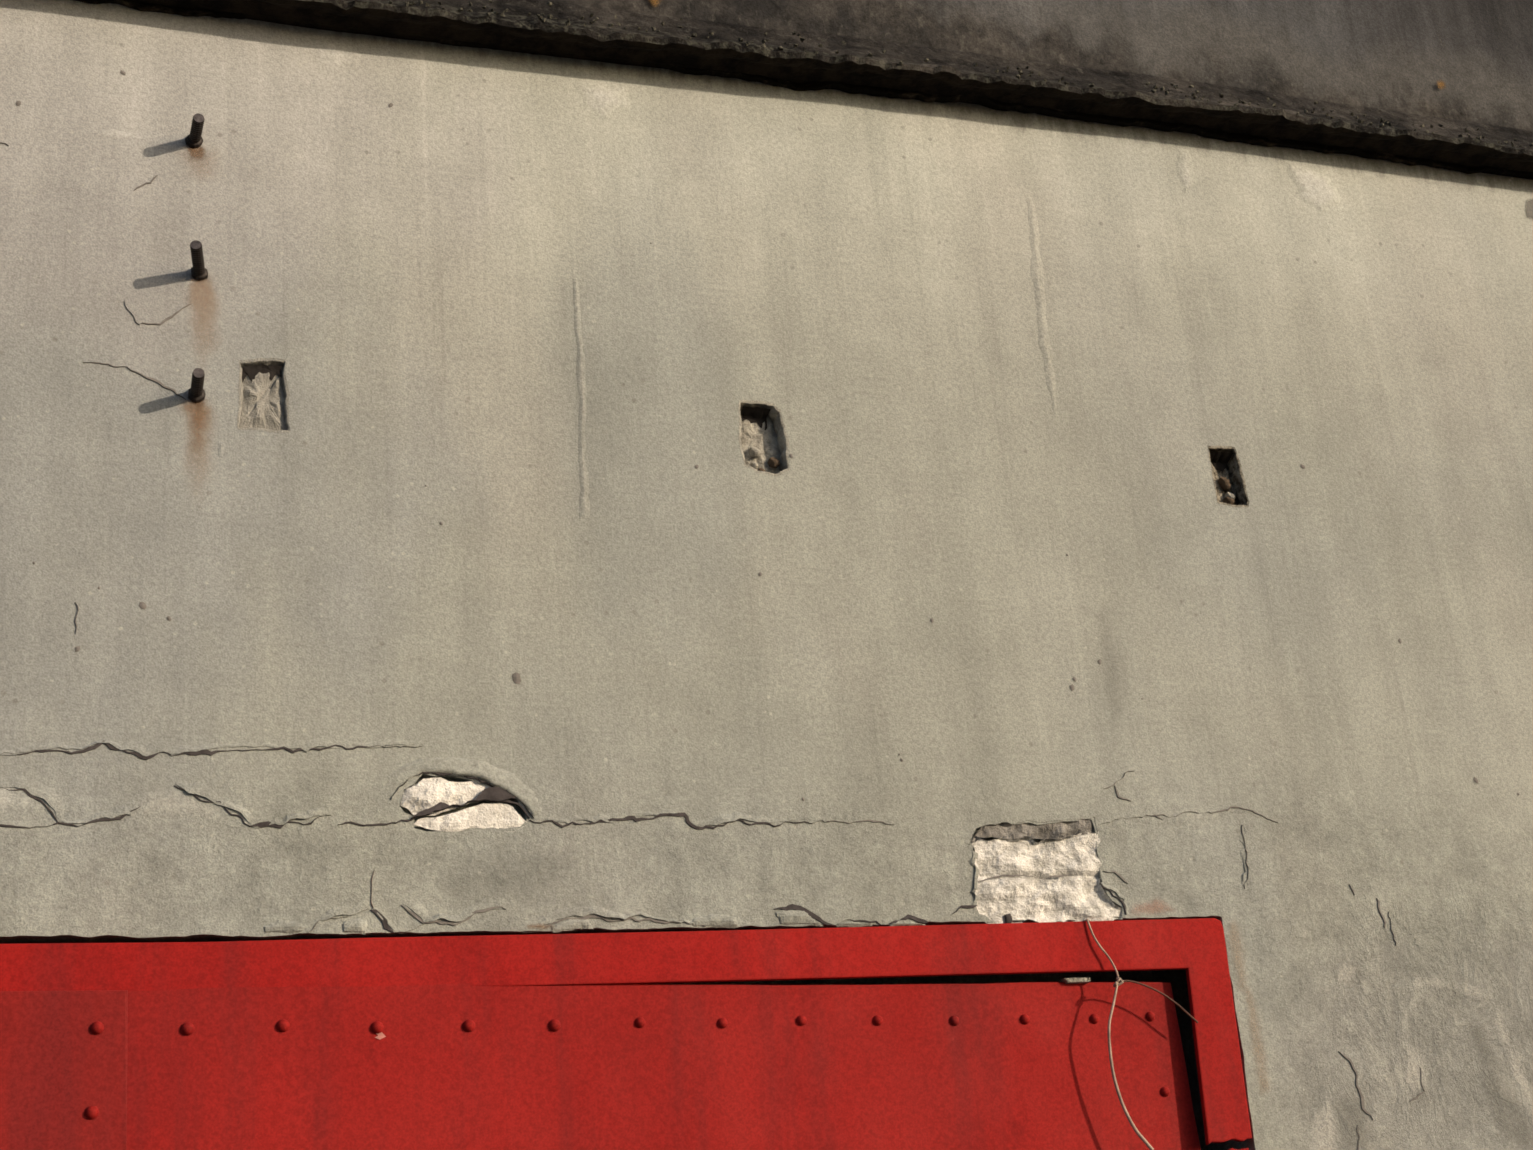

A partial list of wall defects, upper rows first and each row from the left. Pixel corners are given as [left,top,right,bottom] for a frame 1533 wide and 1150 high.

leakage [315,41,361,76]
leakage [573,79,631,121]
leakage [1176,148,1197,193]
leakage [1286,161,1340,213]
crack [125,304,191,325]
crack [83,362,186,400]
crack [0,738,422,829]
crack [530,808,894,830]